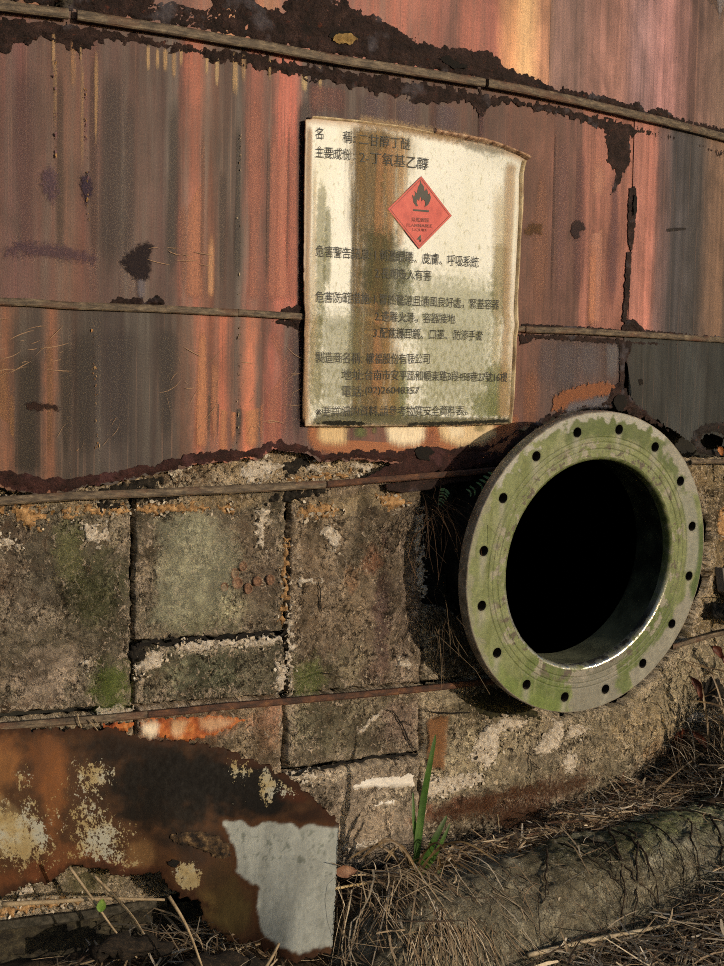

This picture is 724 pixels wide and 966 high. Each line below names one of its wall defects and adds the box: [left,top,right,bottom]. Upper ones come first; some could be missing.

rust [0,0,724,494]
rust [103,715,245,742]
rust [427,775,599,823]